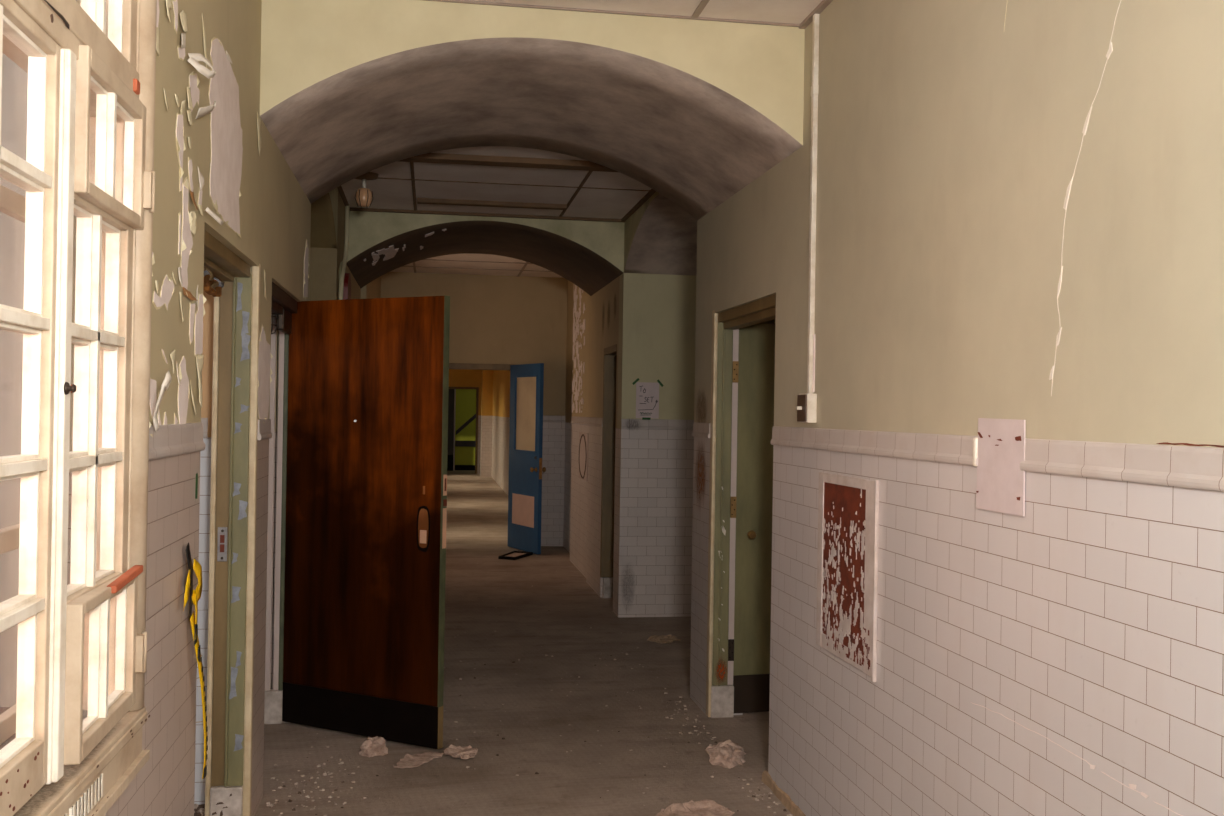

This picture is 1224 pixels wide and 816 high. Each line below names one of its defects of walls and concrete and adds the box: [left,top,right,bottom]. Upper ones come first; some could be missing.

peeling [149,0,273,437]
peeling [364,229,447,266]
crack [1049,1,1121,395]